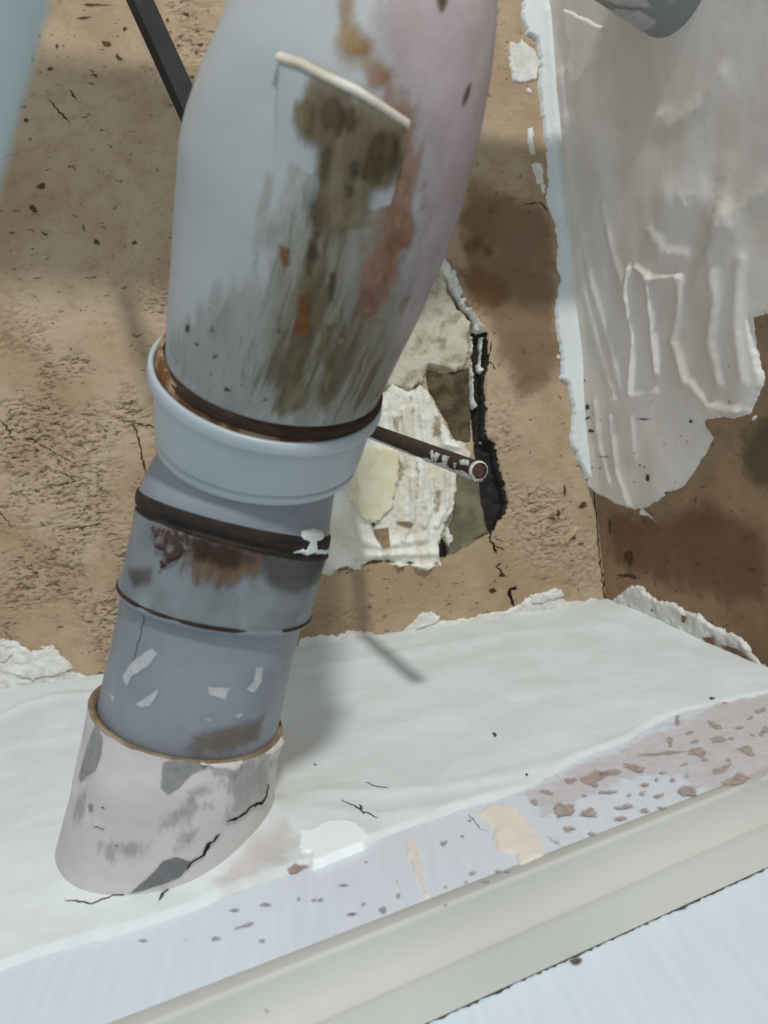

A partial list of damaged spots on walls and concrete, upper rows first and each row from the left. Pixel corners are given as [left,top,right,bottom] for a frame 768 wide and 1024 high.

peeling [509,39,539,94]
peeling [527,127,546,193]
corrosion [280,246,289,266]
corrosion [358,177,415,314]
spalling [322,258,508,576]
corrosion [151,525,264,585]
crack [486,533,517,607]
crack [186,784,269,870]
peeling [288,819,368,874]
crack [342,782,387,818]
peeling [530,707,768,831]
crack [64,894,124,904]